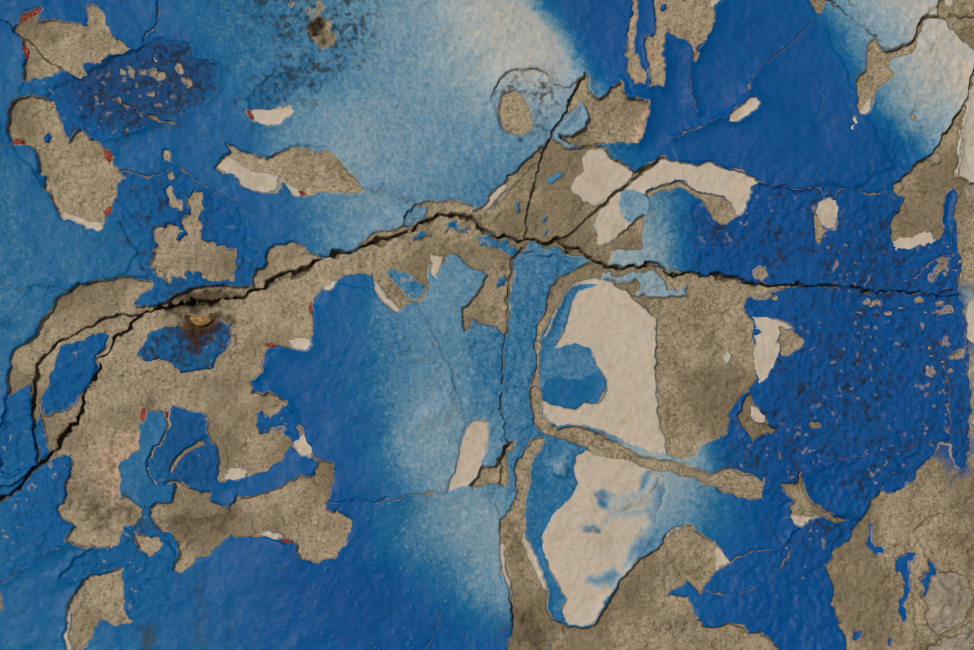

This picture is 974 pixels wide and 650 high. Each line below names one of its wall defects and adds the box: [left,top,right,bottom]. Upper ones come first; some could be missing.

peeling [15,5,129,81]
crack [1,20,185,128]
peeling [120,55,165,81]
peeling [626,0,722,86]
crack [747,0,974,89]
peeling [851,0,974,130]
crack [927,69,974,185]
crack [219,39,957,485]
crack [0,302,191,510]
peeling [8,74,804,650]
spalling [780,105,974,650]
crack [701,521,822,597]